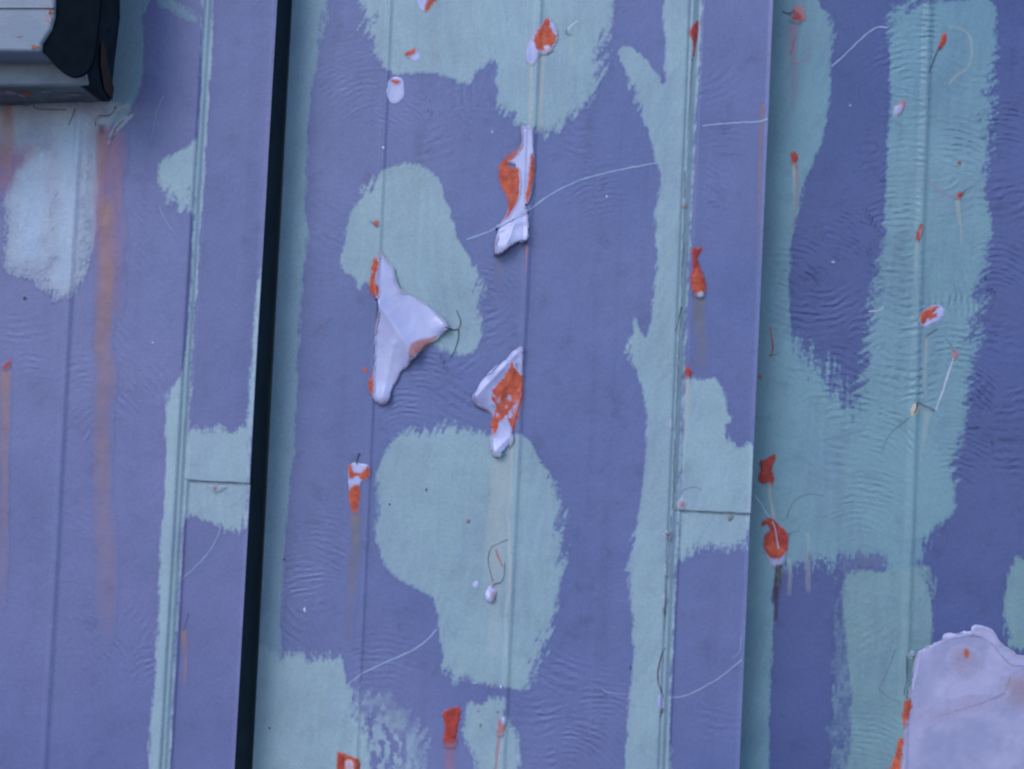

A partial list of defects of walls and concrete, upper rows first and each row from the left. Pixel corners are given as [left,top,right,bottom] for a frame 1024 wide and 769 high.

peeling [494,17,558,292]
rust [86,122,130,646]
peeling [362,250,449,406]
rust [683,245,711,444]
rust [881,223,960,466]
peeling [471,345,526,689]
rust [754,452,812,622]
rust [336,750,362,769]
rust [441,704,463,769]
peeling [888,624,1024,769]